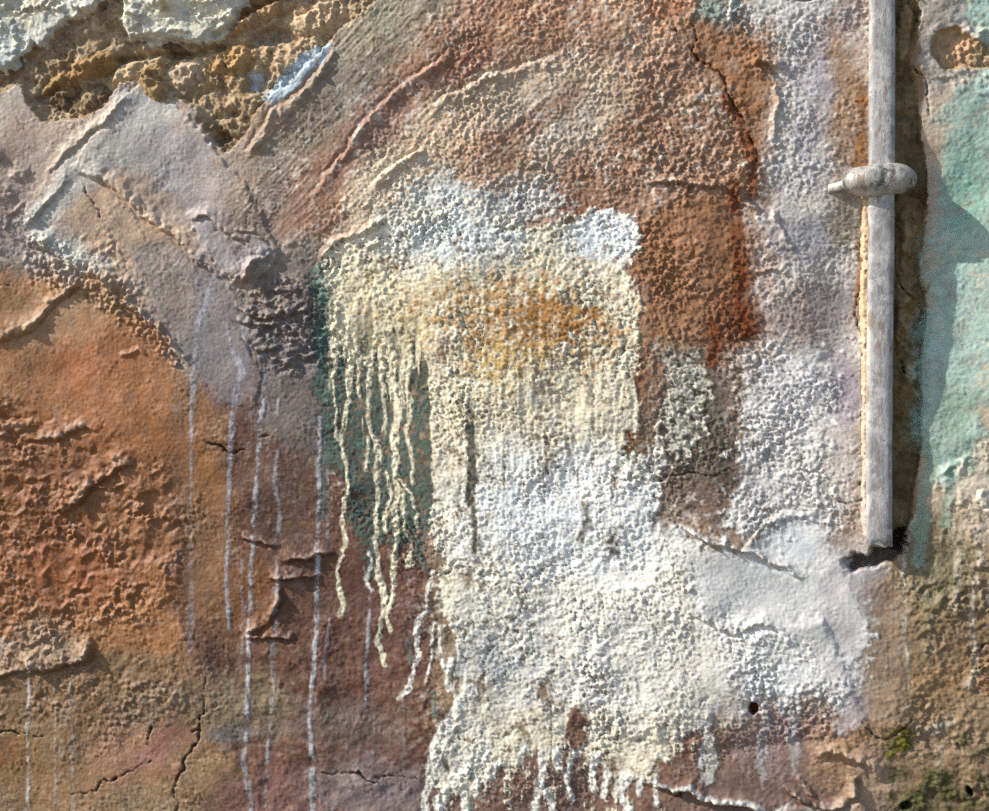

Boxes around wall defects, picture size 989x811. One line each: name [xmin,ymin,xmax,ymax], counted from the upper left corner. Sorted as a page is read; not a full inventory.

spalling [0,0,376,153]
crack [675,30,742,117]
corrosion [622,20,768,411]
peeling [892,0,989,538]
leakage [225,324,246,380]
leakage [256,374,266,459]
corrosion [622,424,642,453]
leakage [680,510,811,575]
leakage [244,574,253,717]
leakage [307,616,319,811]
leakage [649,699,764,811]